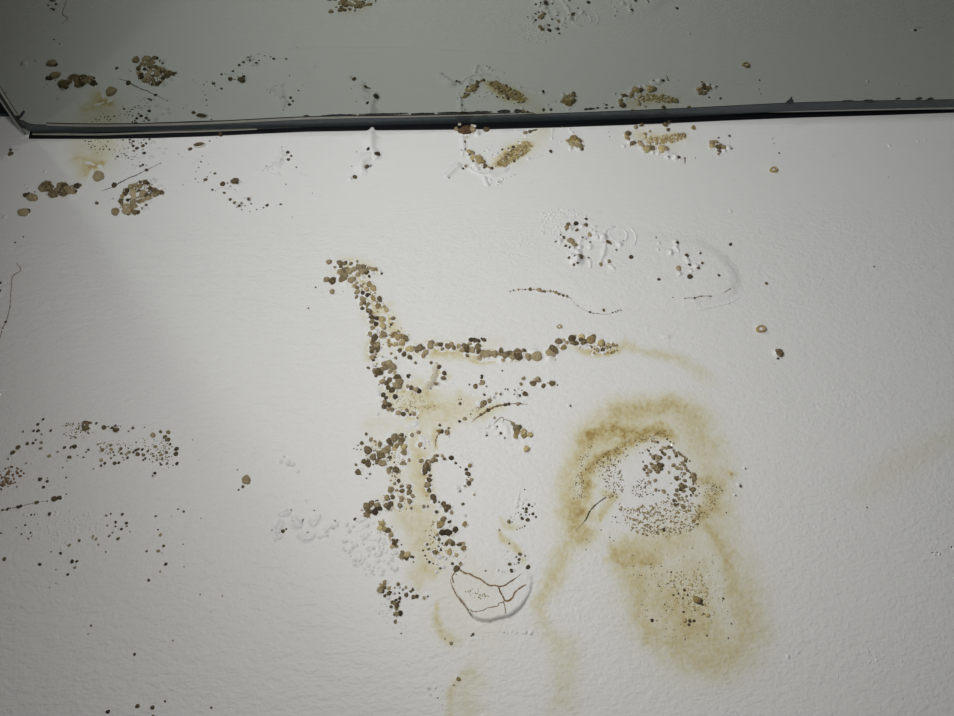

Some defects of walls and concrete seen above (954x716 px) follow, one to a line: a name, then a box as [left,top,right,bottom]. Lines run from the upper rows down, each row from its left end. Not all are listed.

crack [0,263,21,336]
crack [509,286,622,314]
leakage [323,249,796,716]